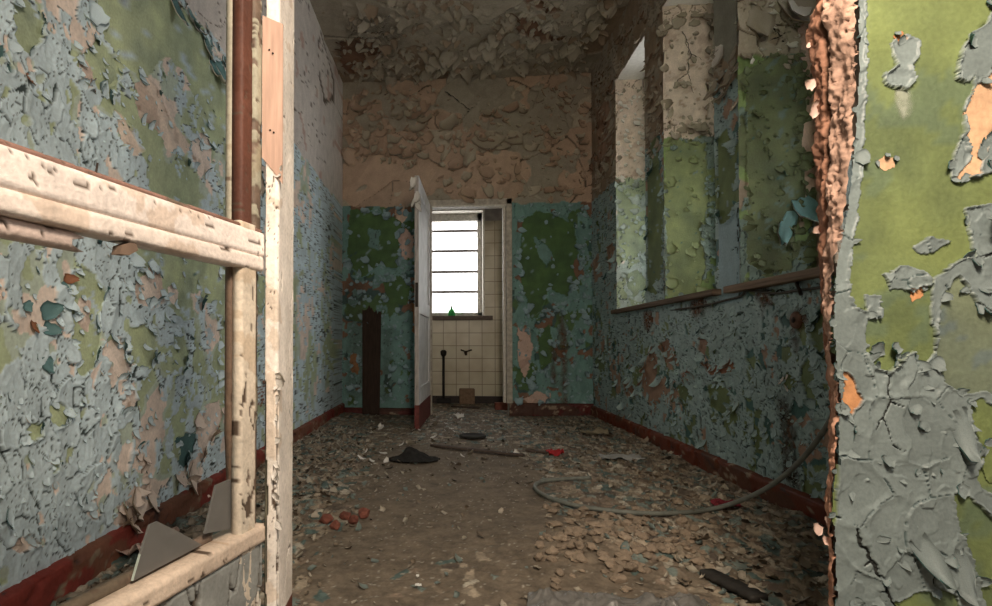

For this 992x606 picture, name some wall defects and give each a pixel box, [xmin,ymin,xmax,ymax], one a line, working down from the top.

peeling [0,0,56,73]
peeling [67,0,226,195]
peeling [257,275,266,319]
peeling [334,0,992,606]
peeling [0,348,99,489]
peeling [23,248,225,534]
crack [876,371,905,452]
peeling [0,476,103,553]
crack [856,528,896,606]